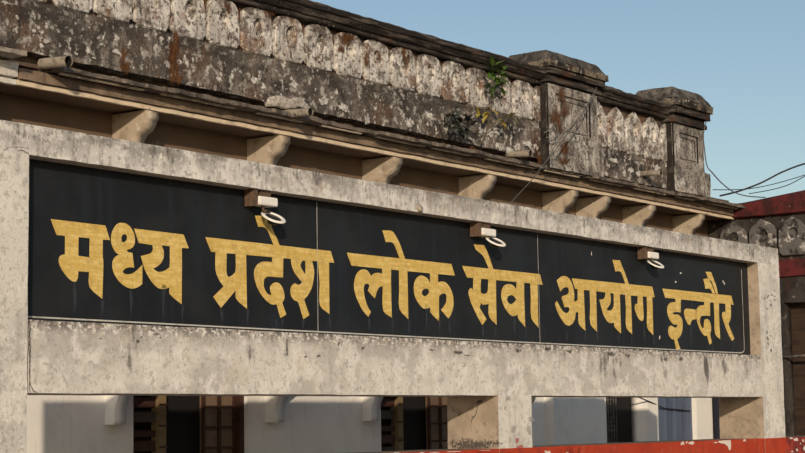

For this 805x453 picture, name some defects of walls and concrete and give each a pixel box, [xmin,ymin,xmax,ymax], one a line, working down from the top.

rust [168,29,183,84]
rust [551,87,571,165]